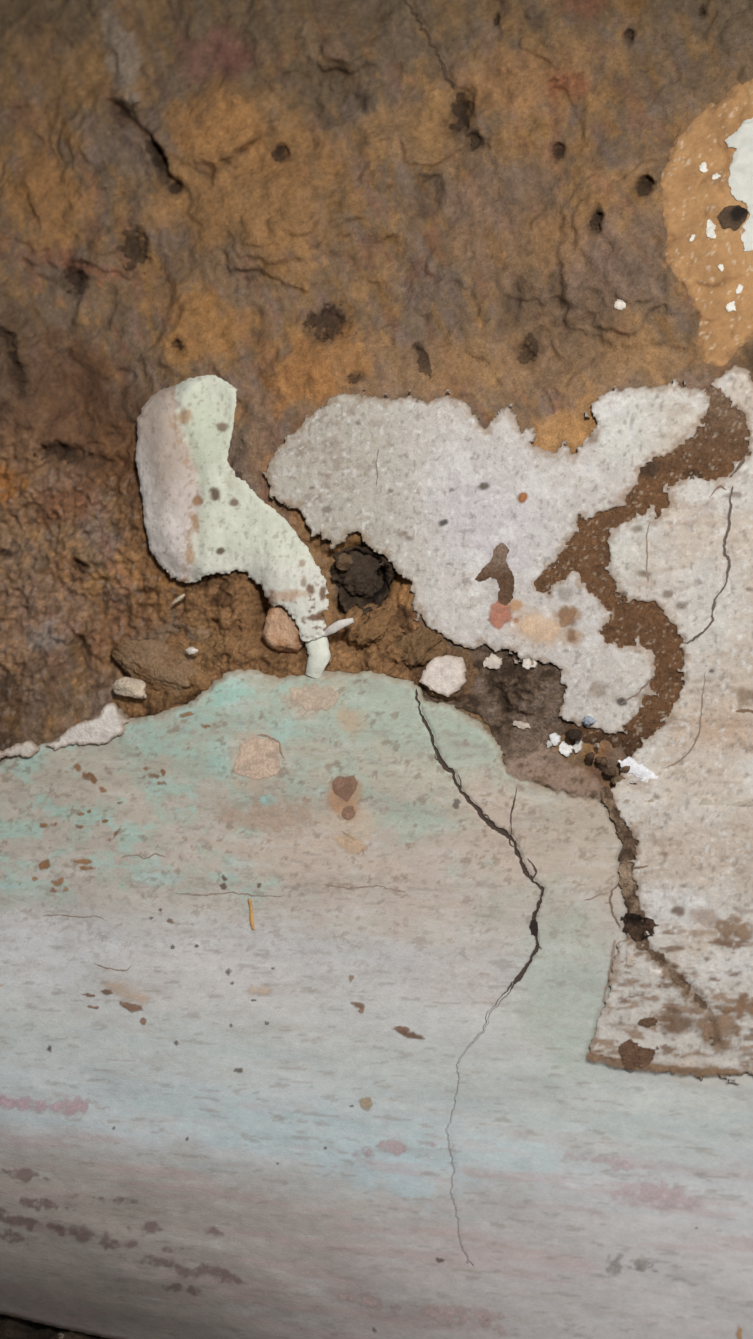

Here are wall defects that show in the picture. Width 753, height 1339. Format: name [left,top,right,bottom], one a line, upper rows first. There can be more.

spalling [0,0,753,801]
crack [415,689,544,1266]